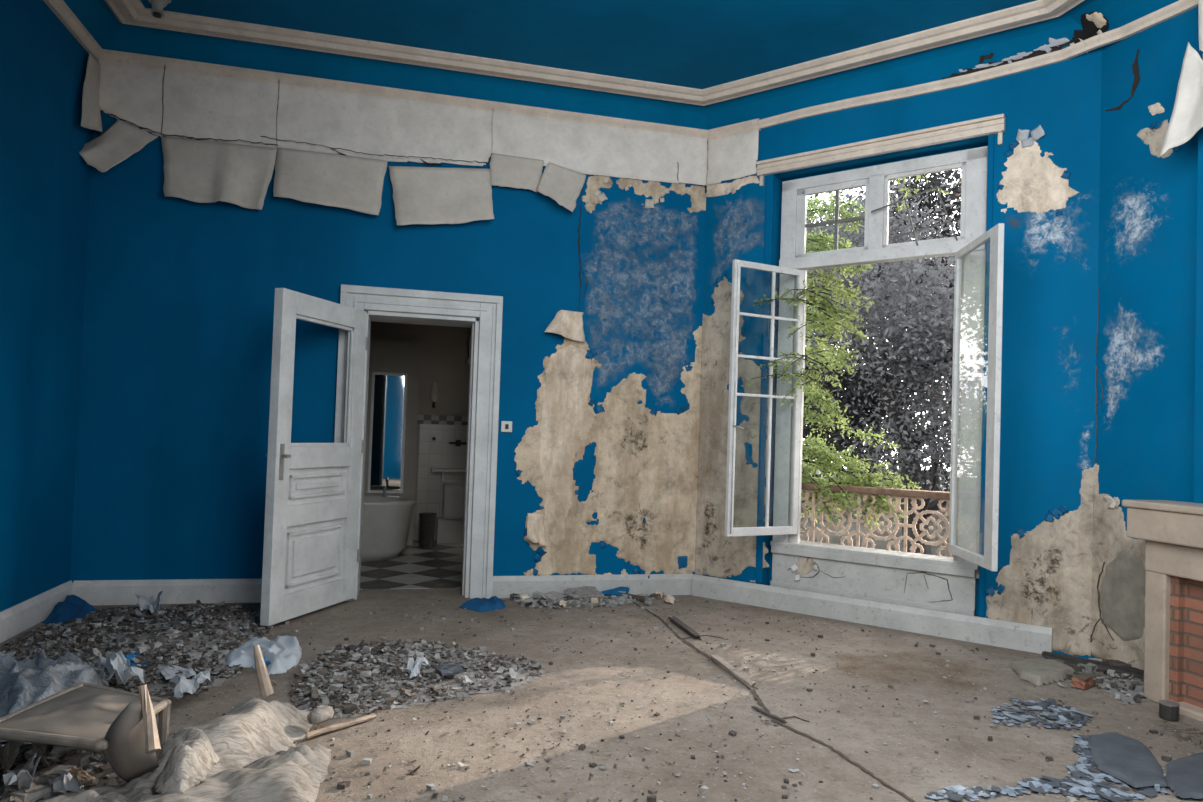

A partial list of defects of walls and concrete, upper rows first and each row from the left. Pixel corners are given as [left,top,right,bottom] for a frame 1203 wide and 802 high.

flaking render [959,11,1110,72]
flaking render [996,125,1079,251]
flaking render [1137,102,1180,158]
flaking render [514,175,771,583]
flaking render [985,464,1146,670]
crack [634,602,915,802]